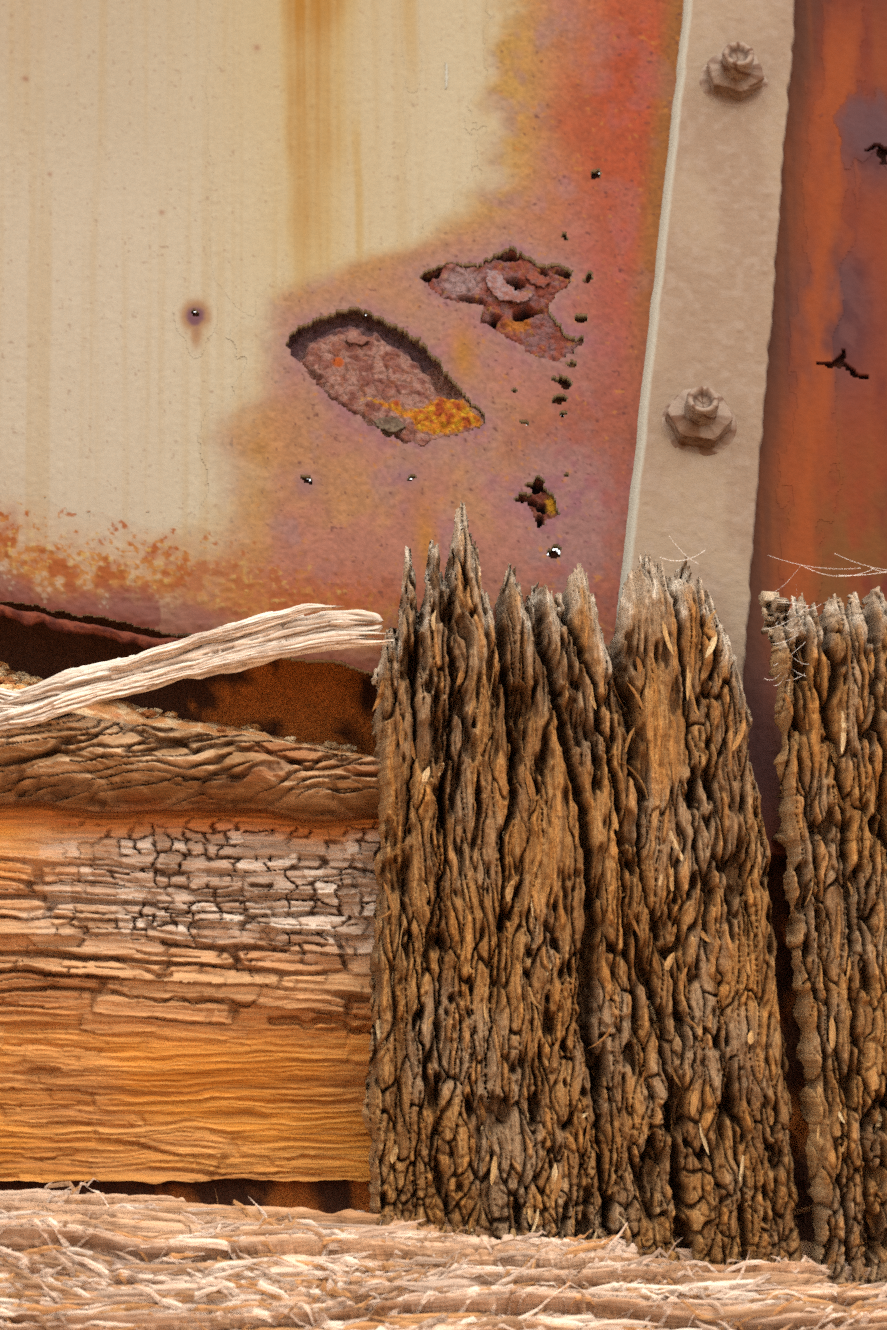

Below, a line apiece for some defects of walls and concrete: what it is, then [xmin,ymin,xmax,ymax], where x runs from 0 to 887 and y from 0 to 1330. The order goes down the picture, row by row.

rust [0,0,684,673]
peeling [486,266,550,303]
rust [776,0,887,611]